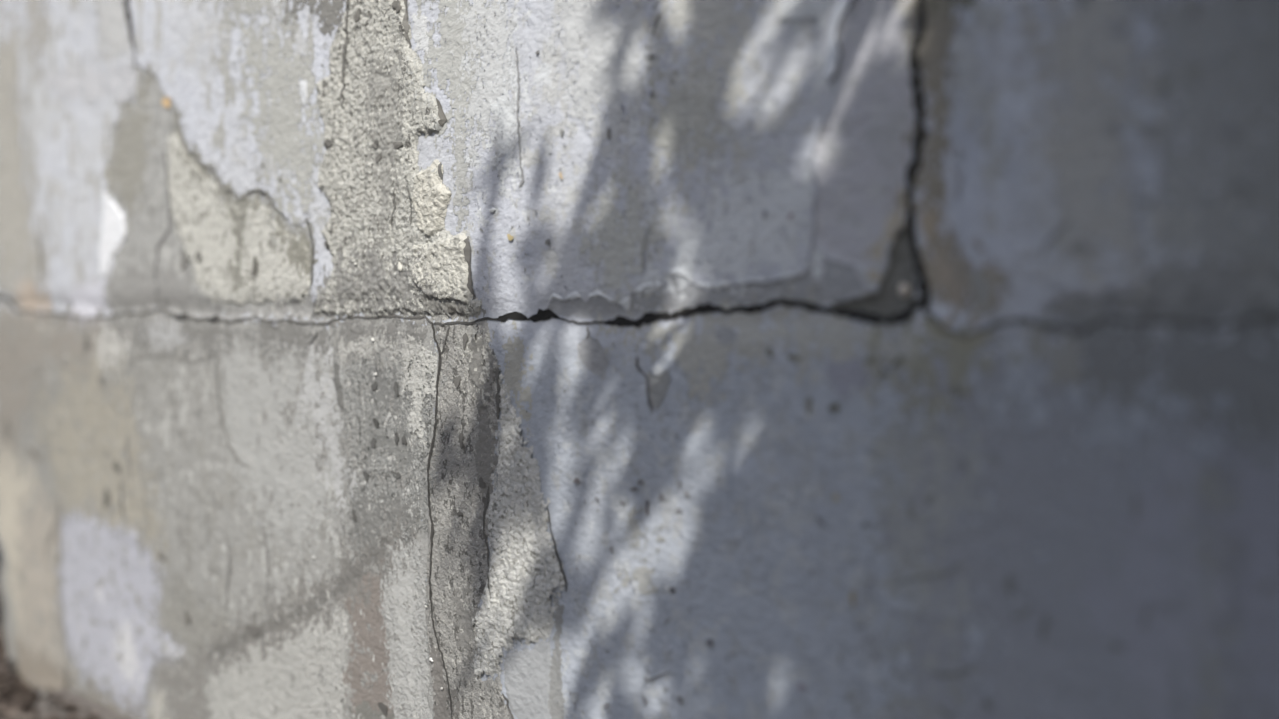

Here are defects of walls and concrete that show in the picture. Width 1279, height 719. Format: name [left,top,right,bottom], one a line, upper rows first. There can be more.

peeling [99,191,126,276]
spalling [166,0,571,683]
crack [0,0,931,719]